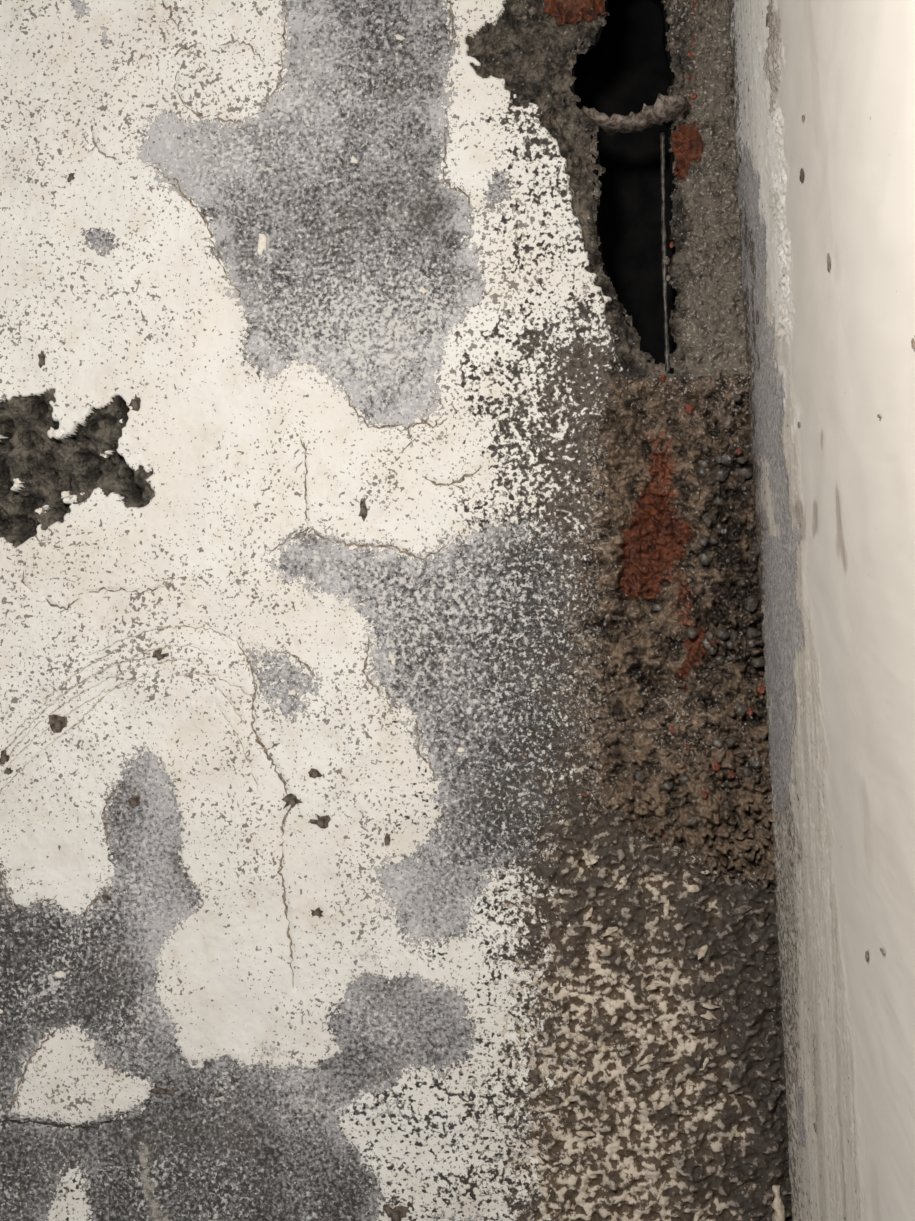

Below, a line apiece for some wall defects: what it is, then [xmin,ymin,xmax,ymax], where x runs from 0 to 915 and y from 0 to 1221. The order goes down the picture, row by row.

peeling [70,0,91,21]
peeling [81,227,119,255]
spalling [0,389,155,547]
spalling [127,0,778,955]
peeling [49,714,67,733]
crack [237,641,294,976]
peeling [0,742,482,1221]
peeling [527,1069,565,1106]